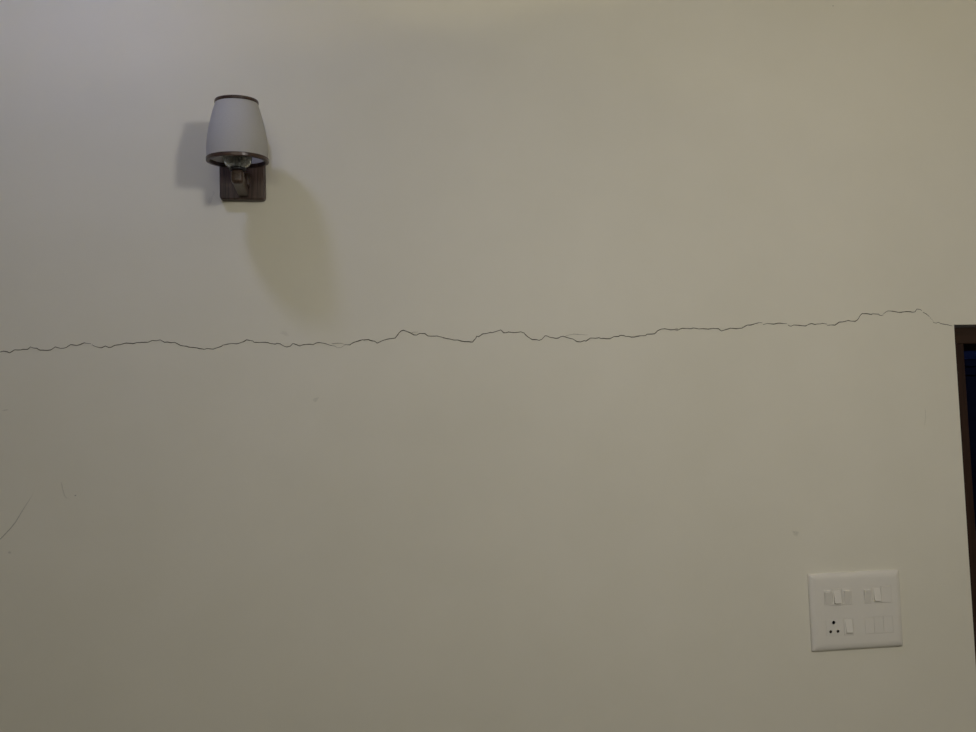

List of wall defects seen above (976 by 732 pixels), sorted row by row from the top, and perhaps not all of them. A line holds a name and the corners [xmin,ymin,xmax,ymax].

crack [1,309,951,353]